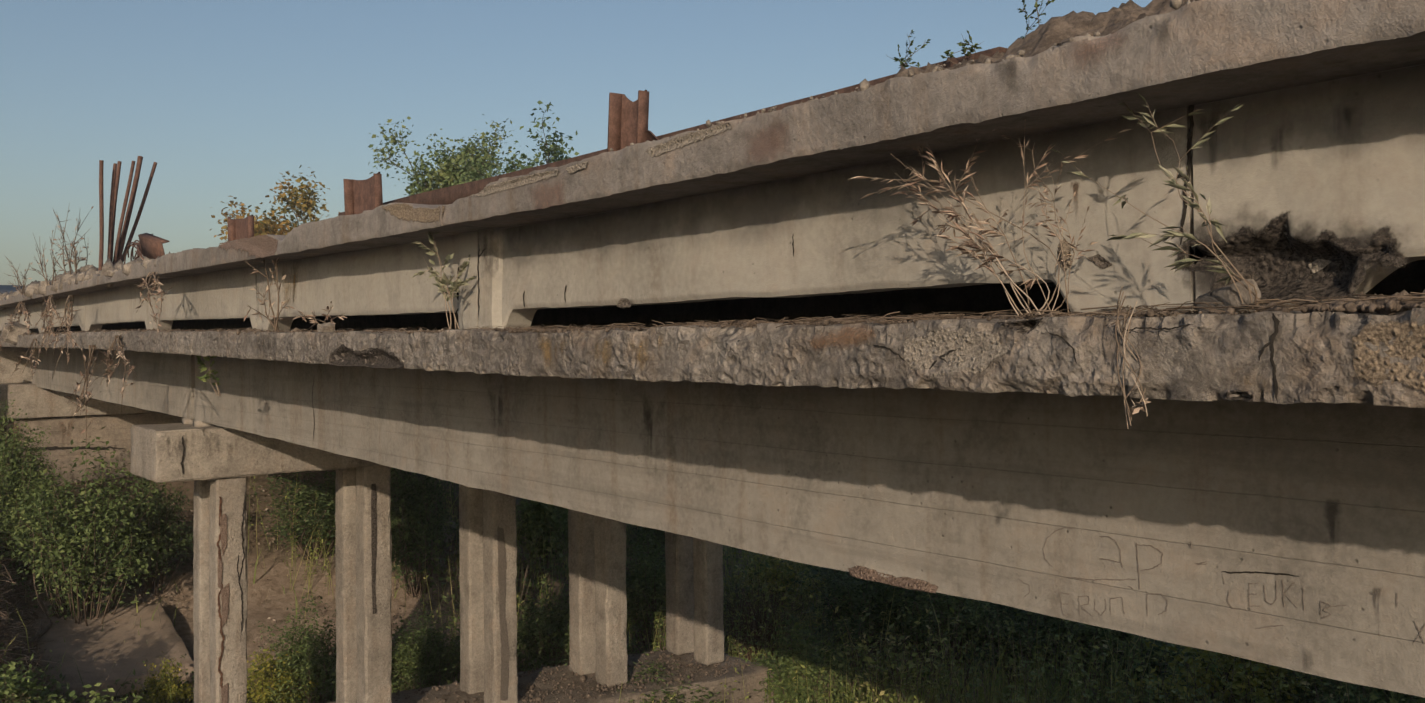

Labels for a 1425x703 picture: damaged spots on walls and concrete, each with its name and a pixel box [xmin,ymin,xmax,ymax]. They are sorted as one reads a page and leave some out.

crack [1177,105,1194,245]
spalling [1176,211,1407,306]
spalling [329,344,404,368]
crack [1258,313,1280,403]
crack [237,495,245,645]
spalling [848,566,938,593]